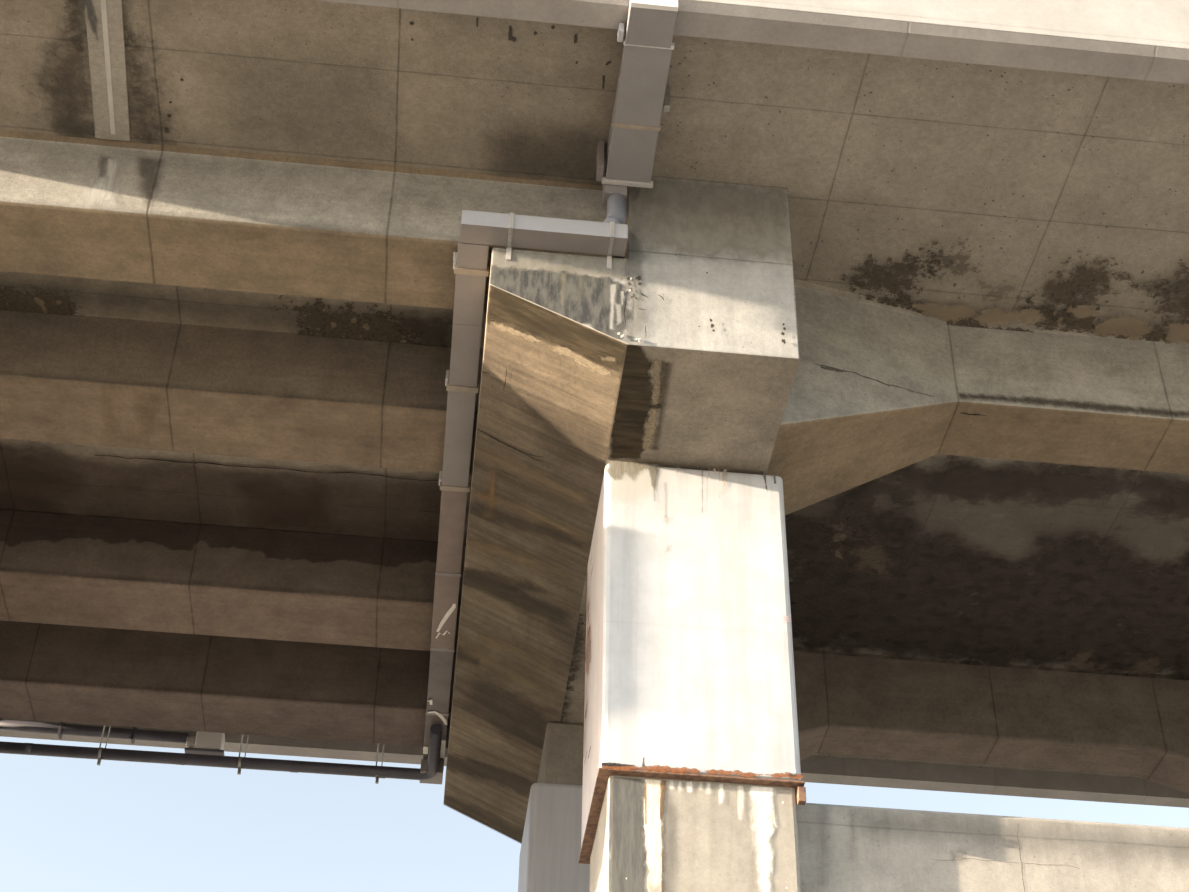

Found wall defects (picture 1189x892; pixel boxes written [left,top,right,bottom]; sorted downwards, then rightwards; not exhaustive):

damp [69,0,96,33]
damp [82,158,121,205]
peeling [0,283,81,316]
peeling [269,295,451,348]
peeling [841,242,1189,344]
damp [486,249,663,489]
crack [814,363,934,397]
damp [0,446,441,543]
damp [463,569,565,623]
damp [785,458,1189,680]
damp [447,755,531,796]
damp [750,786,784,892]